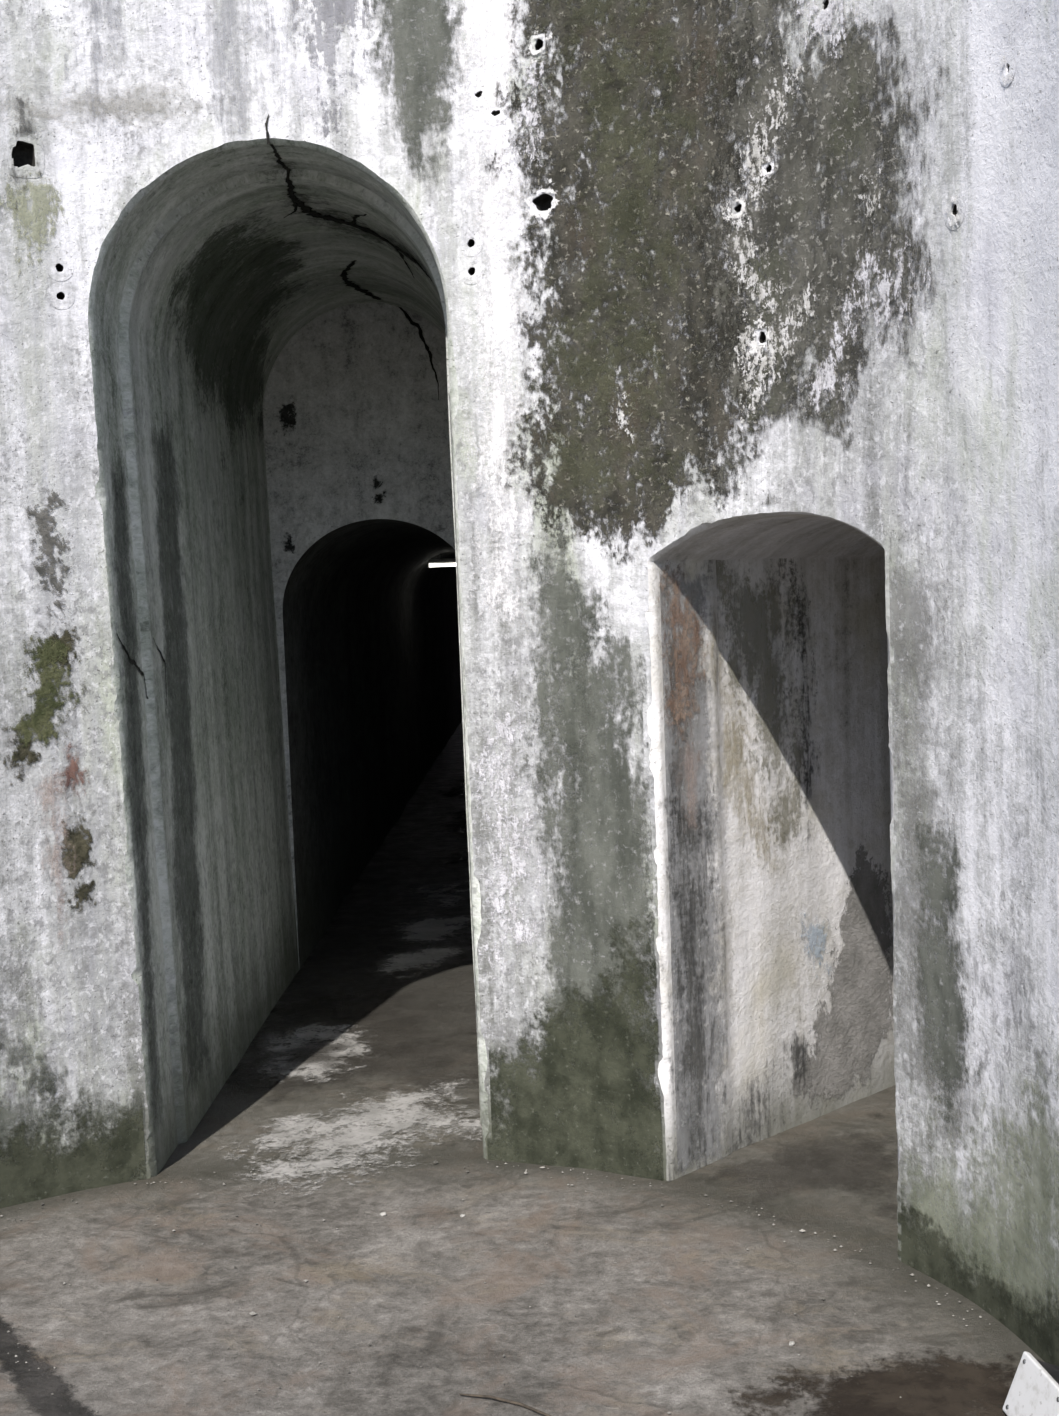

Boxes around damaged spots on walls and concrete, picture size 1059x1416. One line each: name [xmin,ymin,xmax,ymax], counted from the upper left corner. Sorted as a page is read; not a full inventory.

spalling [3,130,45,178]
damp [206,0,256,124]
crack [265,114,439,400]
damp [272,0,895,1209]
damp [0,468,159,1156]
damp [154,431,210,1084]
damp [889,570,980,1146]
damp [223,994,482,1195]
damp [728,1348,1017,1416]